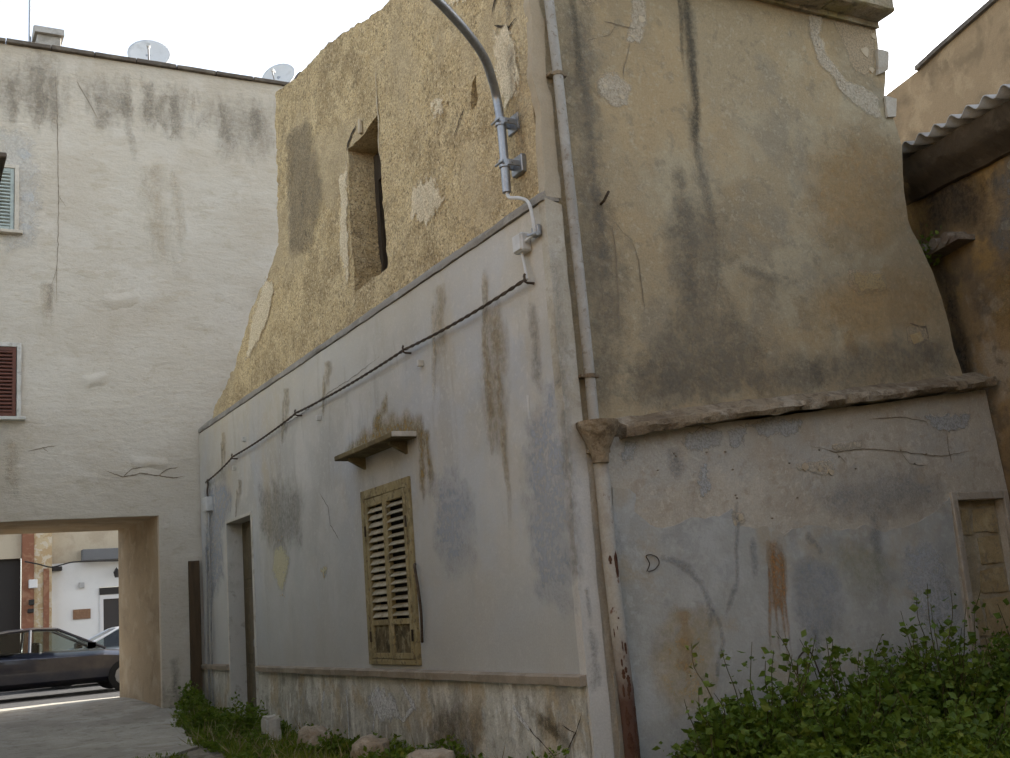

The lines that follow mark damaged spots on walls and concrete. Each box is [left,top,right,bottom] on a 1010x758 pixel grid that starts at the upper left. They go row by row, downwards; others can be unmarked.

crack [55,73,97,150]
peeling [809,14,880,117]
crack [53,178,65,301]
crack [107,467,183,478]
crack [812,417,967,466]
corrosion [613,617,640,758]